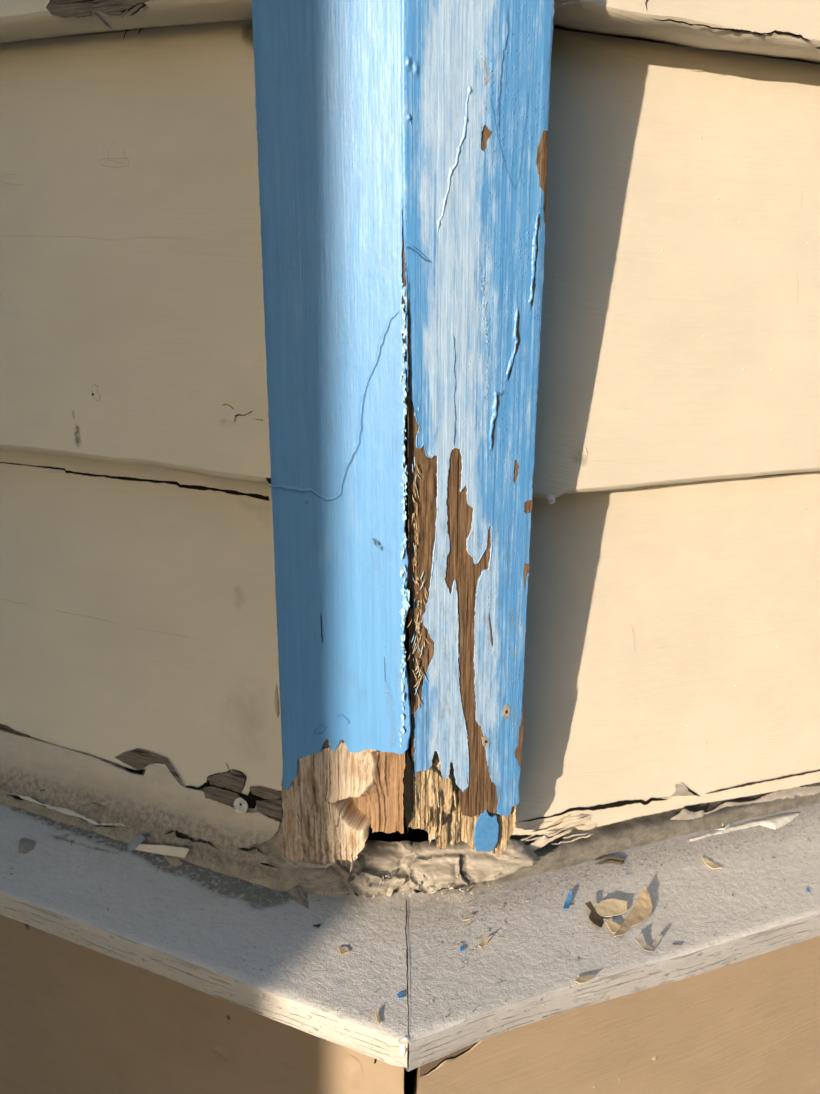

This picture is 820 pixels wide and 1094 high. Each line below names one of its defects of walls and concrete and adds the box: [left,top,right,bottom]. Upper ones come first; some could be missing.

peeling [408,401,498,817]
peeling [502,704,524,767]